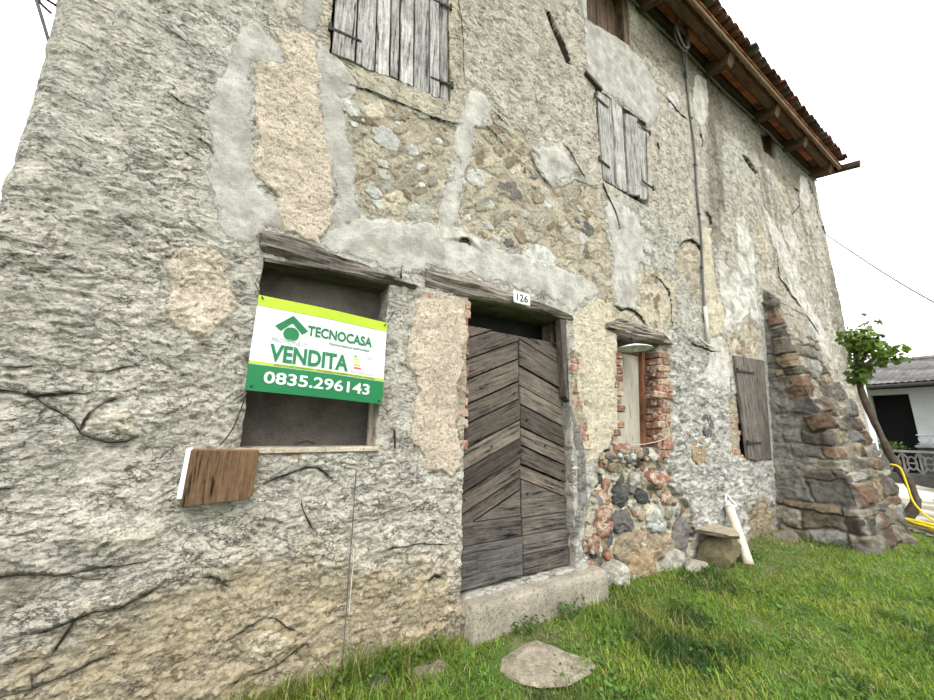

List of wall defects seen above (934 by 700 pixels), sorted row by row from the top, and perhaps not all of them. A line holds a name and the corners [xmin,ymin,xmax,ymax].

spalling [340,84,455,225]
crack [0,362,34,370]
crack [0,389,134,443]
crack [84,365,133,373]
spalling [458,110,709,587]
crack [0,585,161,698]